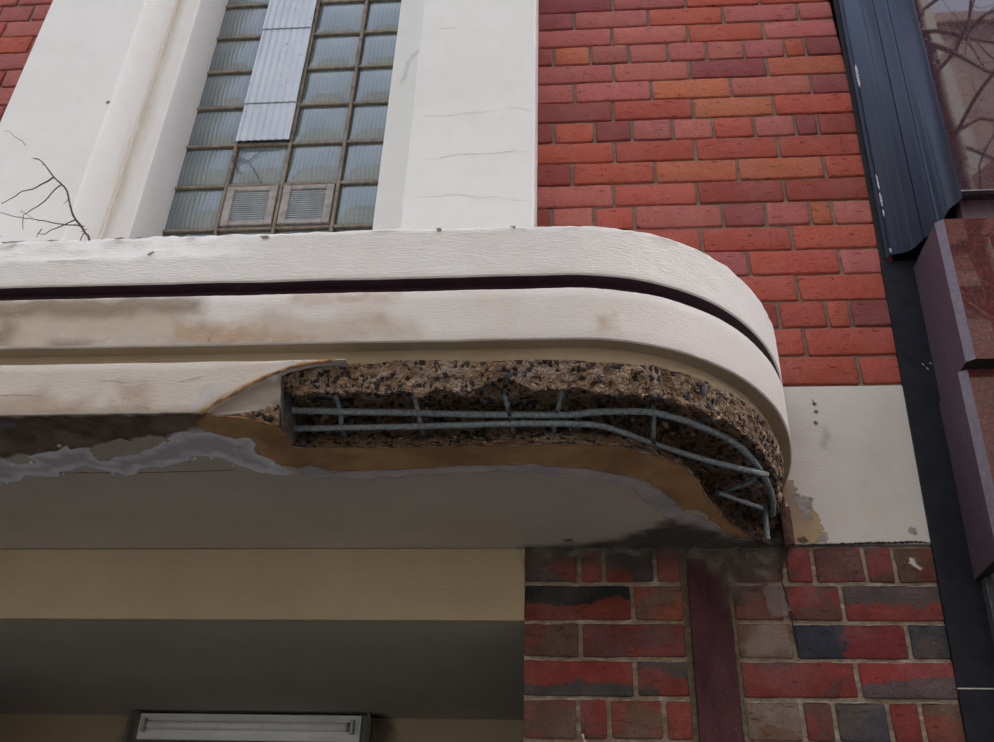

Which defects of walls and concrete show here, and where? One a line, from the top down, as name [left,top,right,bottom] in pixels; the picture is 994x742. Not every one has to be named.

spalling [0,358,828,545]